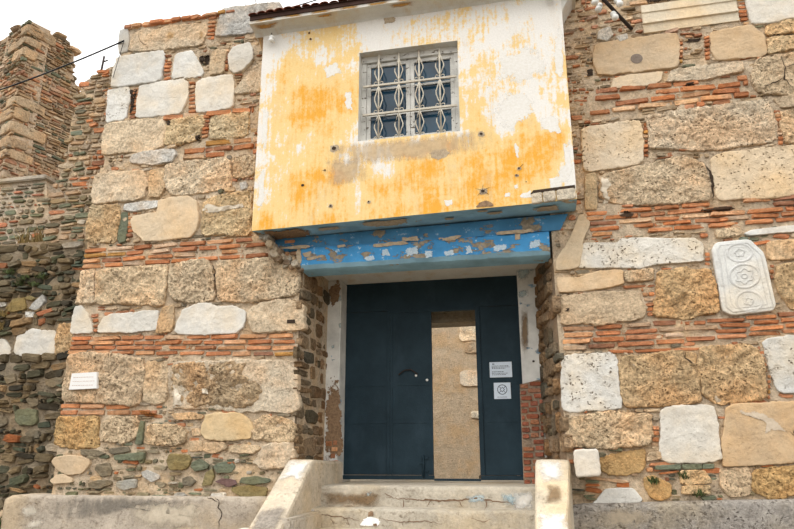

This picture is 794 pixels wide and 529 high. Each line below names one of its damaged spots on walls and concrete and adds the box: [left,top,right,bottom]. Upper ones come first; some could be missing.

peeling [494,27,564,130]
peeling [540,116,561,134]
flaking render [505,142,576,212]
flaking render [476,188,502,215]
peeling [361,219,408,227]
flaking render [254,227,340,275]
peeling [365,236,433,261]
peeling [439,235,461,256]
peeling [493,228,541,251]
flaking render [325,376,344,461]
peeling [281,462,307,479]
crack [384,493,516,525]